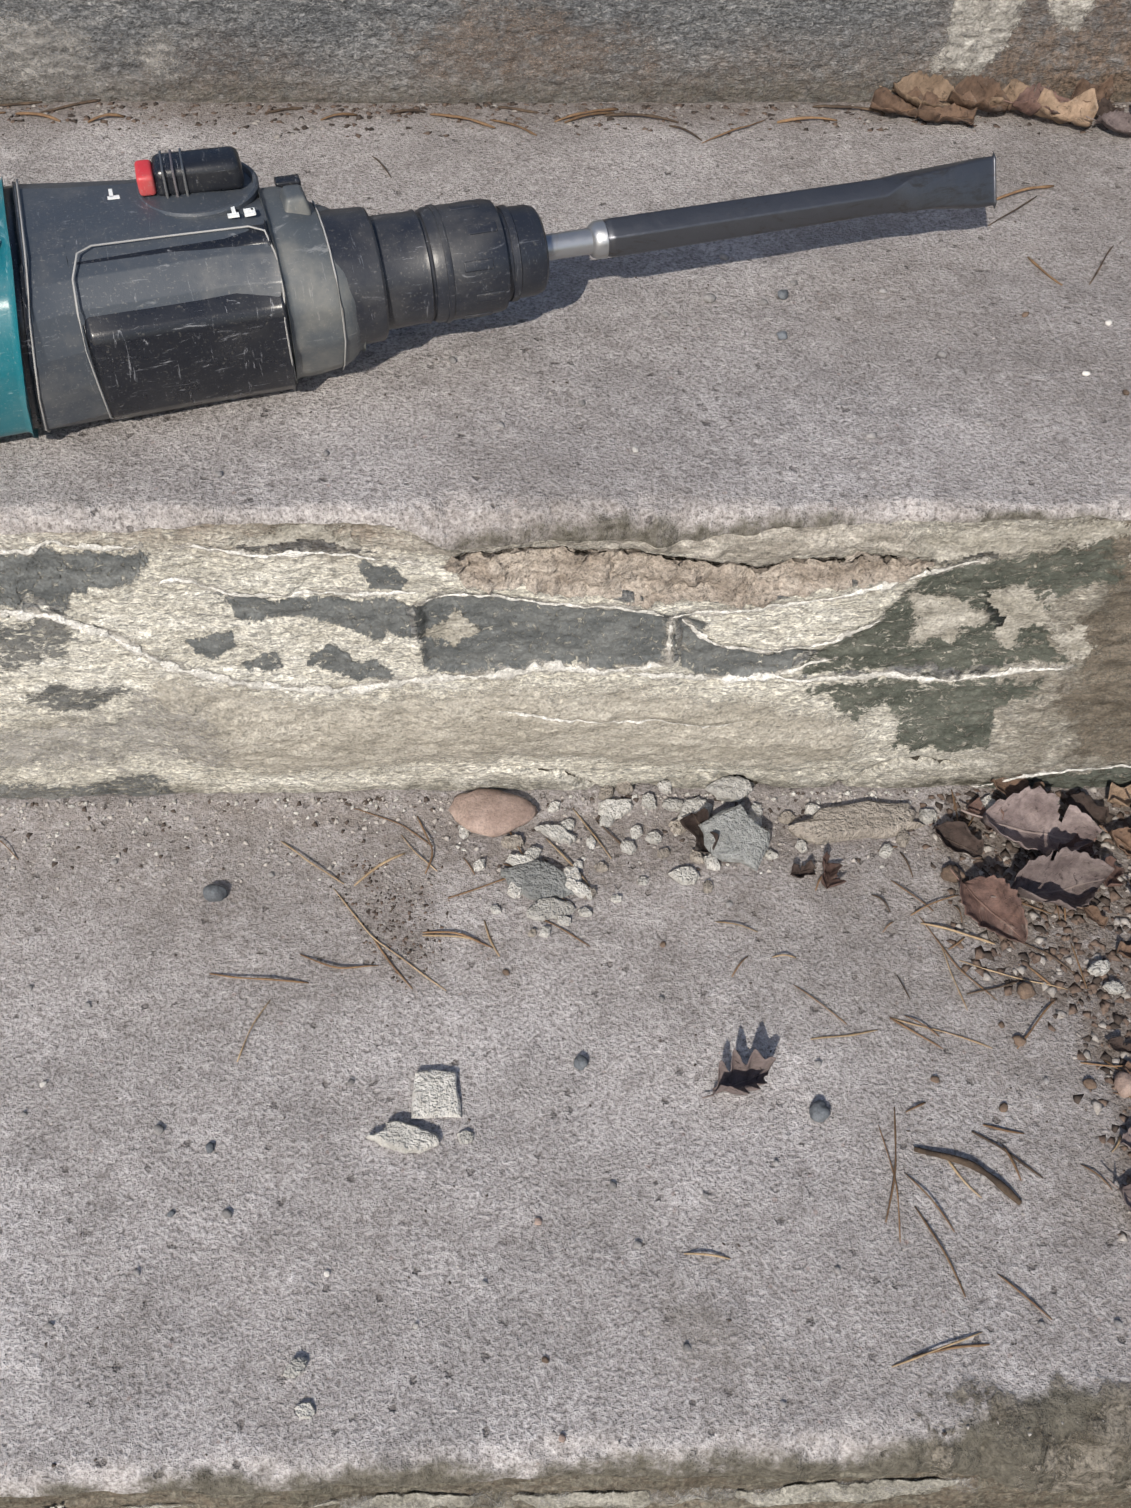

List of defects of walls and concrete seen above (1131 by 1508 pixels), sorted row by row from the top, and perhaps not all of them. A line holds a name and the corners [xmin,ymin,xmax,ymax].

peeling [185,518,1131,753]